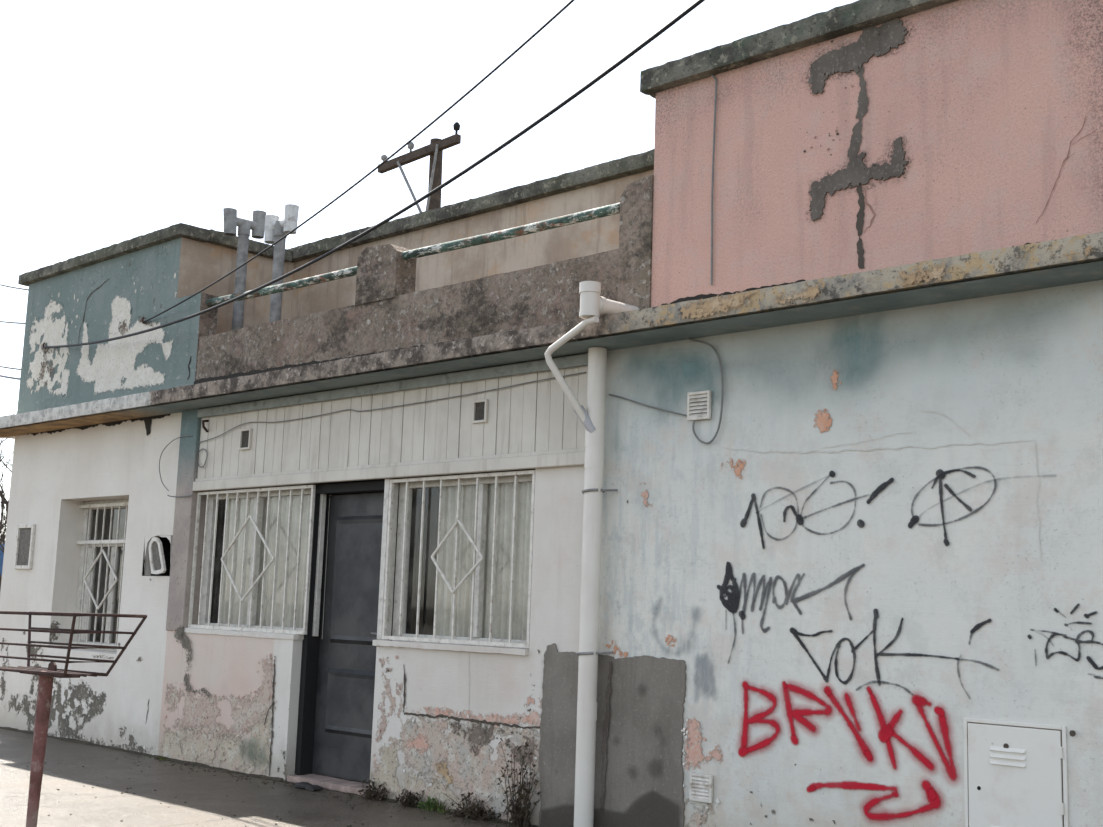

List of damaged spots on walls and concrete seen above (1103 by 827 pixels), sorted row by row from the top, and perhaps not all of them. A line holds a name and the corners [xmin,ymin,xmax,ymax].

crack [803,17,912,269]
crack [1024,115,1094,245]
peeling [26,261,173,397]
peeling [721,457,745,479]
peeling [813,408,832,433]
peeling [0,621,60,731]
spalling [48,625,286,775]
spalling [370,655,545,822]
peeling [681,717,723,770]